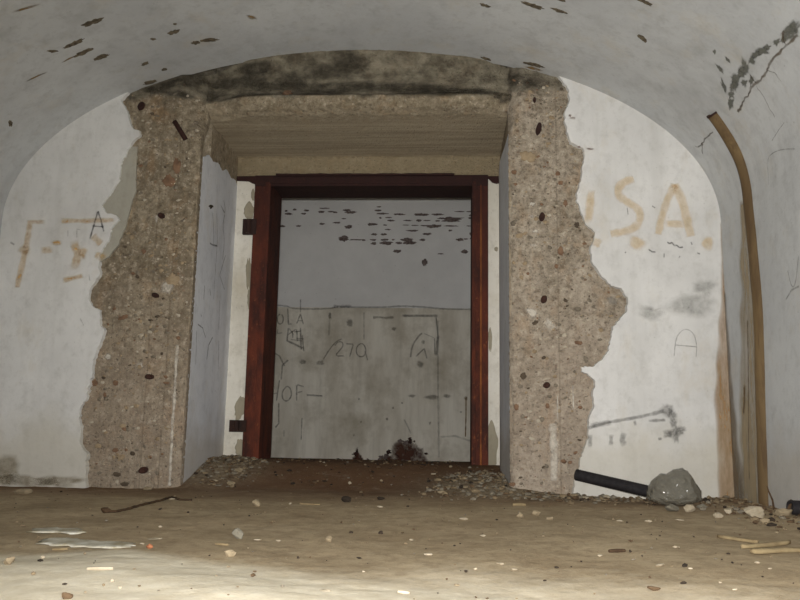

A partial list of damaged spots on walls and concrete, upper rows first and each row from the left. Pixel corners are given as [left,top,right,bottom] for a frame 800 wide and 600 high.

peeling [521,0,568,14]
leakage [144,54,485,100]
leakage [716,21,800,109]
crack [737,31,798,112]
spalling [81,50,627,495]
rust [717,204,757,503]